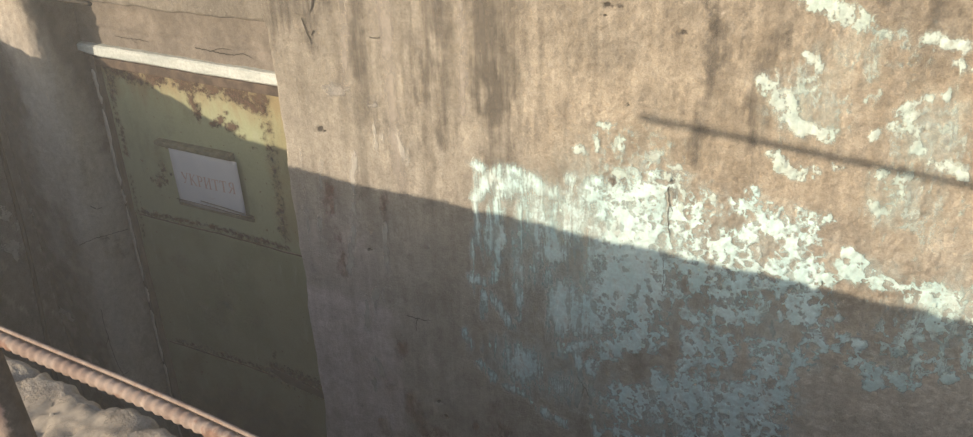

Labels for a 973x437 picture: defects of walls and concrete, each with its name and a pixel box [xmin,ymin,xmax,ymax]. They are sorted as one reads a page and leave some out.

crack [301,0,314,44]
leakage [421,0,503,144]
leakage [706,0,719,96]
peeling [756,50,850,144]
peeling [806,0,973,103]
peeling [867,88,970,182]
peeling [467,122,973,437]